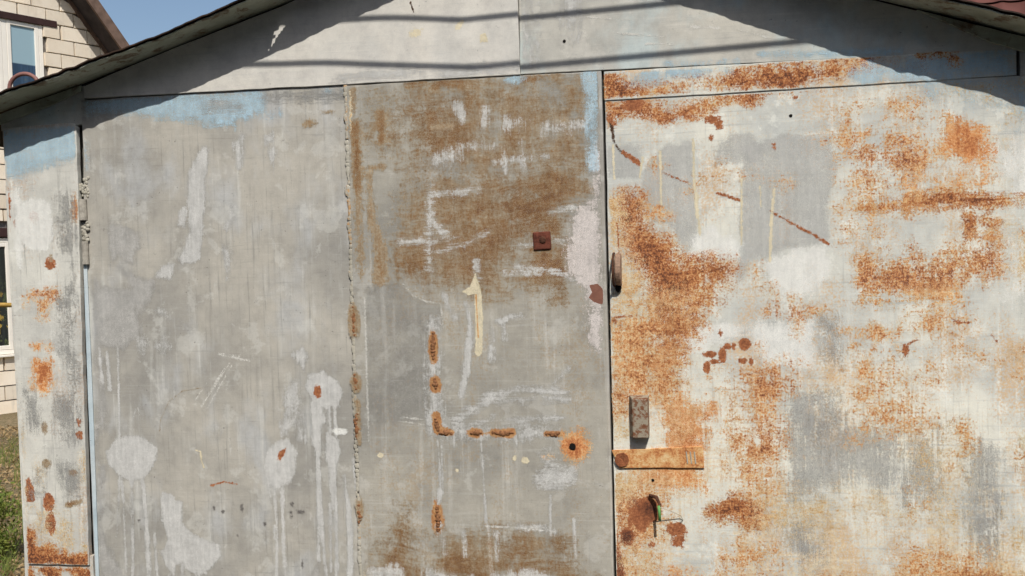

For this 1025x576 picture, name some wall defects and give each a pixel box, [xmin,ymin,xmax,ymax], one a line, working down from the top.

rust [302,109,334,129]
rust [45,254,56,270]
rust [21,285,64,323]
rust [346,51,1025,576]
rust [27,339,56,399]
rust [21,419,90,576]